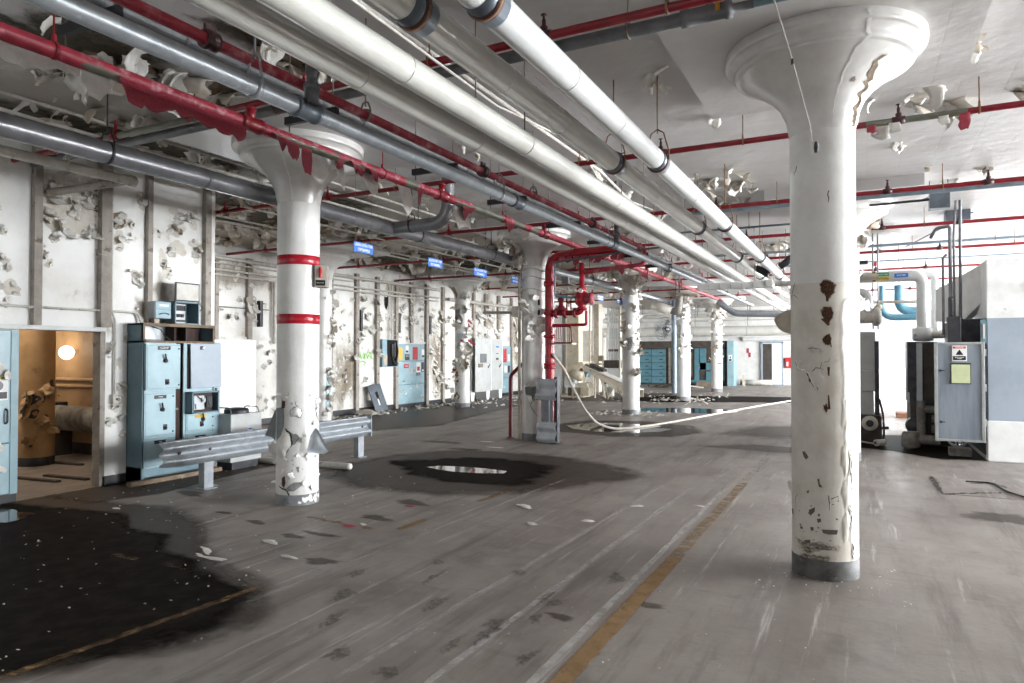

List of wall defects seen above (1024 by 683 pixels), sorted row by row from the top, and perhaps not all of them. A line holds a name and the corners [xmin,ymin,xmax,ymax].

peeling [0,40,256,177]
crack [833,7,873,113]
peeling [902,85,974,131]
peeling [43,168,135,268]
peeling [157,208,204,280]
peeling [689,165,760,205]
peeling [257,205,556,504]
peeling [549,229,735,378]
rust [820,279,836,347]
water stain [213,463,275,480]
water stain [328,441,637,505]
water stain [0,475,266,677]